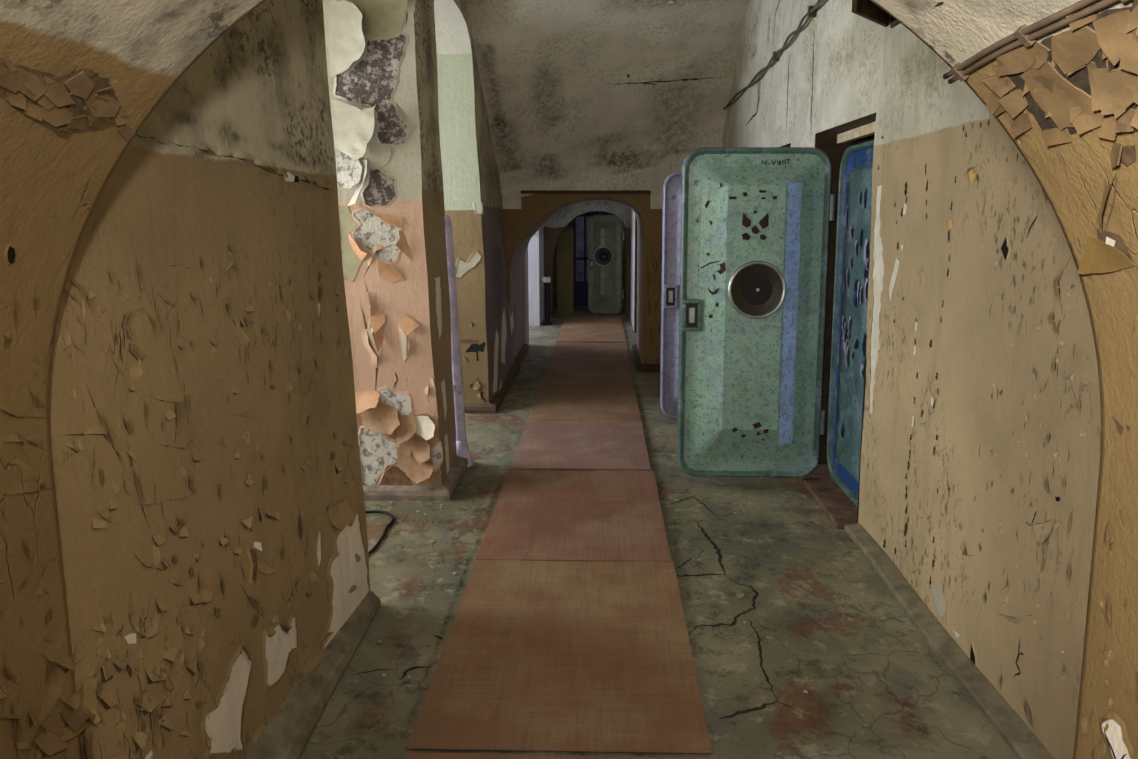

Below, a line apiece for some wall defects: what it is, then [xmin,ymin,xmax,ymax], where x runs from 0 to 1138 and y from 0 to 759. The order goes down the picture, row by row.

flaking render [0,0,450,492]
flaking render [455,249,483,279]
peeling [980,0,1138,501]
flaking render [0,364,370,759]
crack [663,496,790,719]
flaking render [1081,647,1138,759]